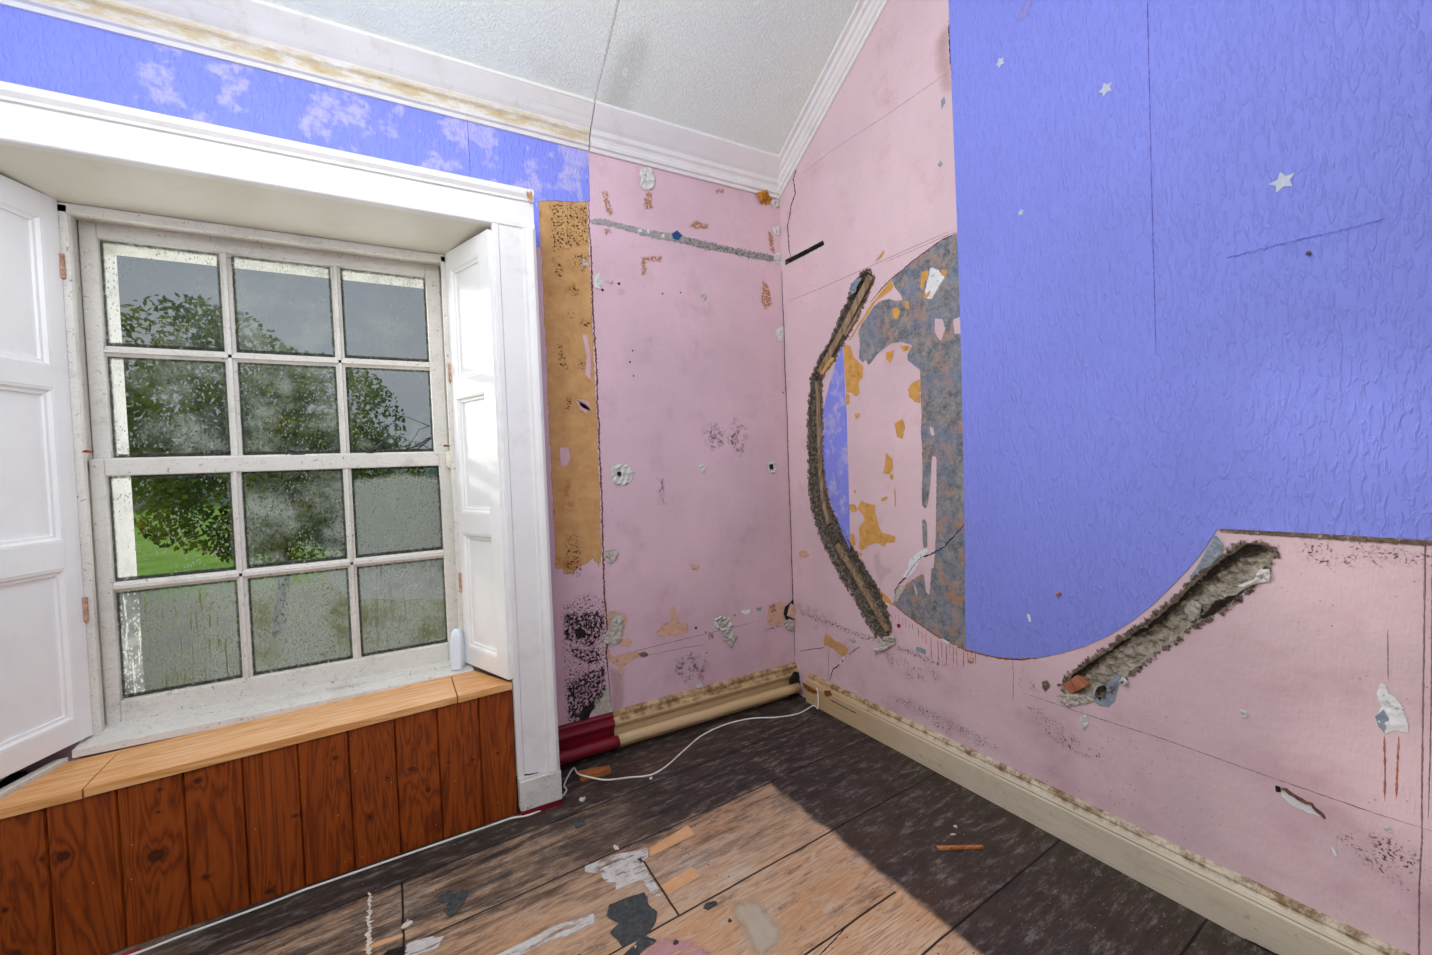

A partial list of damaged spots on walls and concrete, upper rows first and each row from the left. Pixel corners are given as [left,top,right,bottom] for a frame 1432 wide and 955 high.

peeling [539,200,619,574]
flaking render [858,233,967,650]
peeling [1238,569,1271,590]
damp [563,596,613,722]
spalling [600,611,648,675]
peeling [656,607,688,636]
spalling [741,599,796,631]